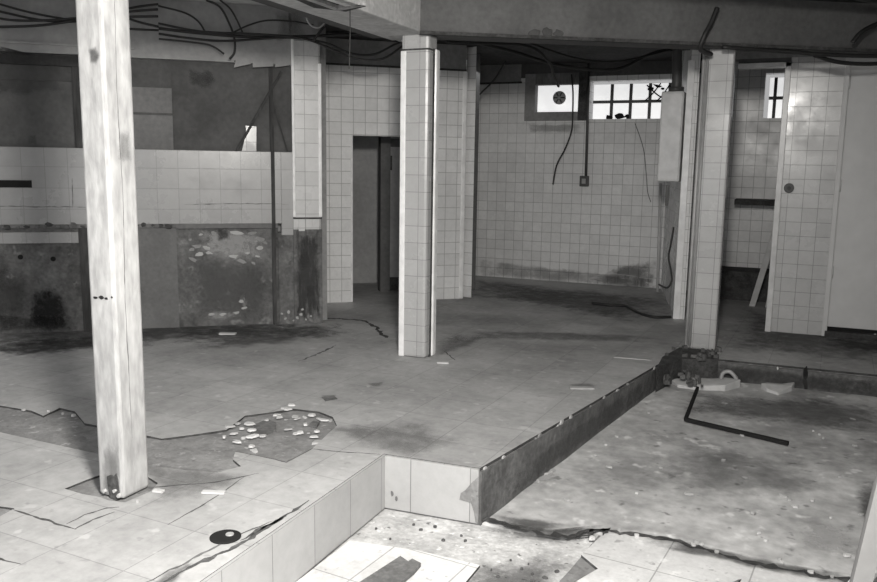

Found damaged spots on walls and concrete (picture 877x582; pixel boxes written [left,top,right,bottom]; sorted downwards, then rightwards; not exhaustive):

peeling [188,229,267,265]
water stain [607,266,651,287]
water stain [0,259,93,353]
water stain [494,285,650,316]
spalling [653,345,722,392]
peeling [0,407,98,454]
peeling [147,403,336,472]
peeling [68,473,157,502]
crack [11,507,116,529]
crack [147,500,309,582]